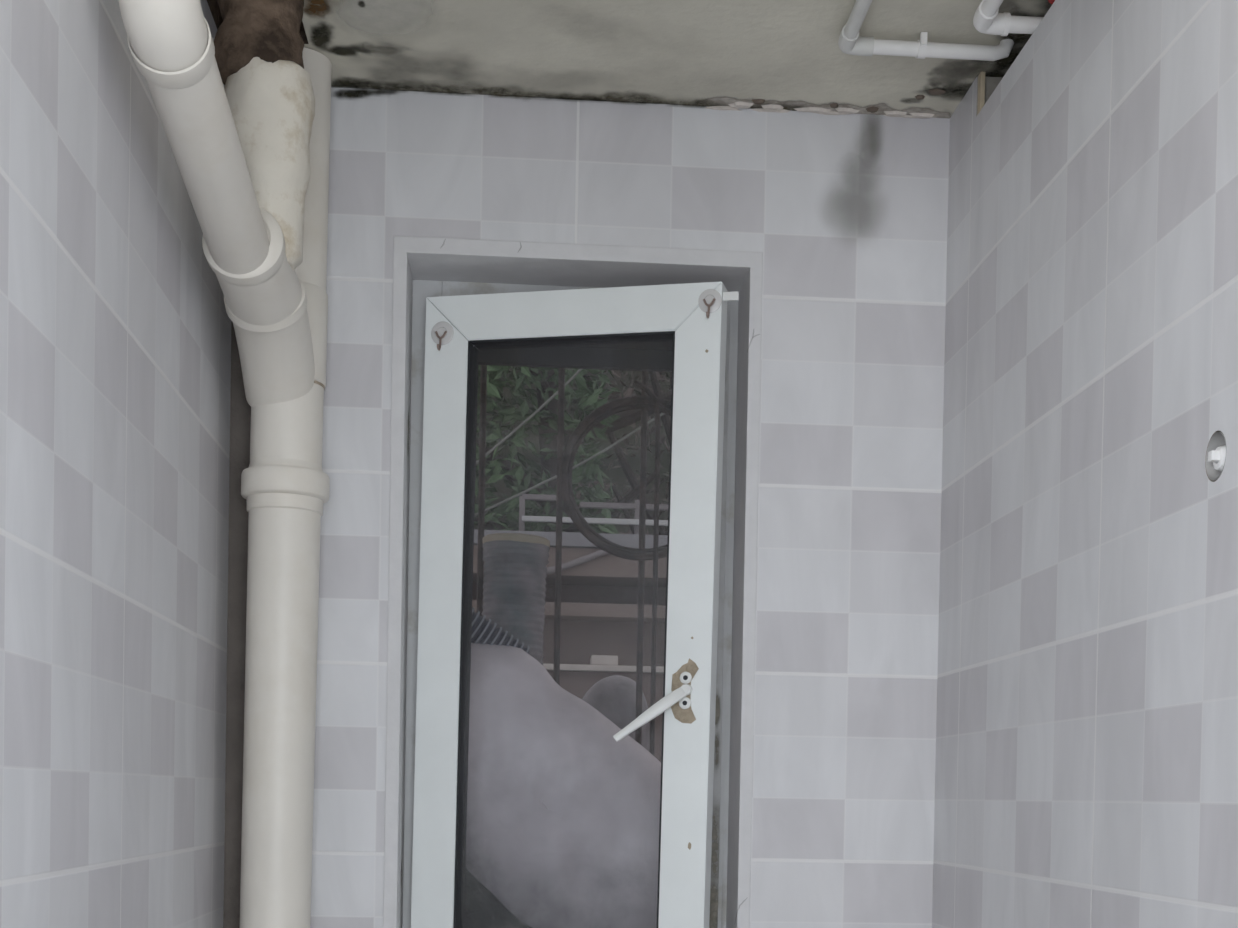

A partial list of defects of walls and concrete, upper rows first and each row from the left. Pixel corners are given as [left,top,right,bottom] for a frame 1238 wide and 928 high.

leakage [312,23,396,56]
leakage [331,79,720,107]